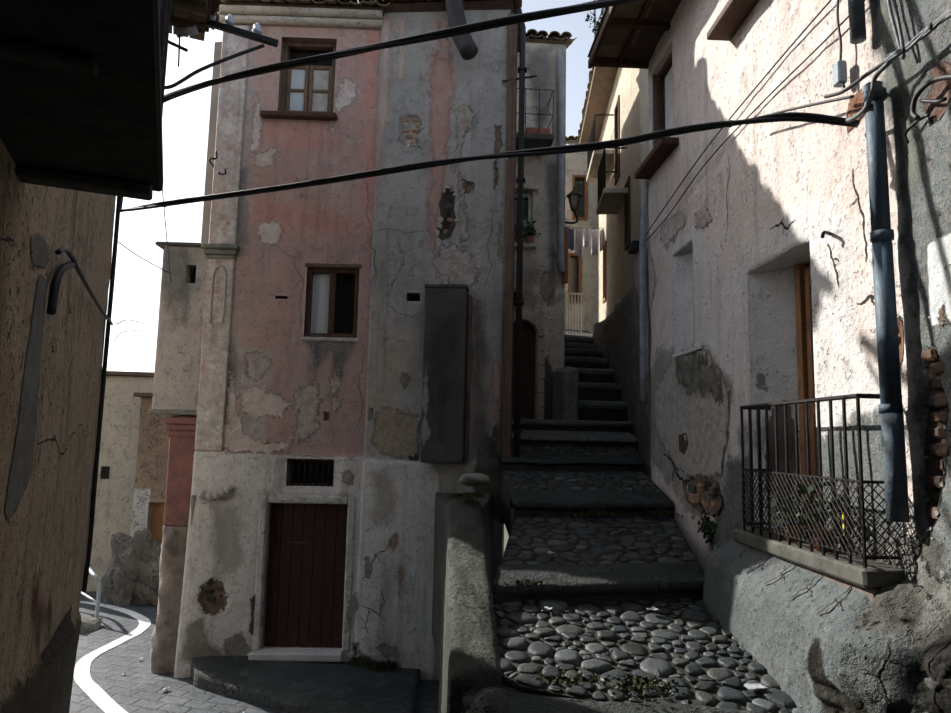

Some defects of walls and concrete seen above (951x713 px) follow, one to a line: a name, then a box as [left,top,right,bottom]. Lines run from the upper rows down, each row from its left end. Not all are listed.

peeling [376,19,406,164]
peeling [399,19,481,288]
crack [37,423,93,455]
peeling [223,370,292,455]
peeling [368,368,432,461]
peeling [654,348,730,517]
spalling [870,346,951,713]
spalling [197,578,229,617]
crack [361,535,394,635]
spalling [806,637,868,713]